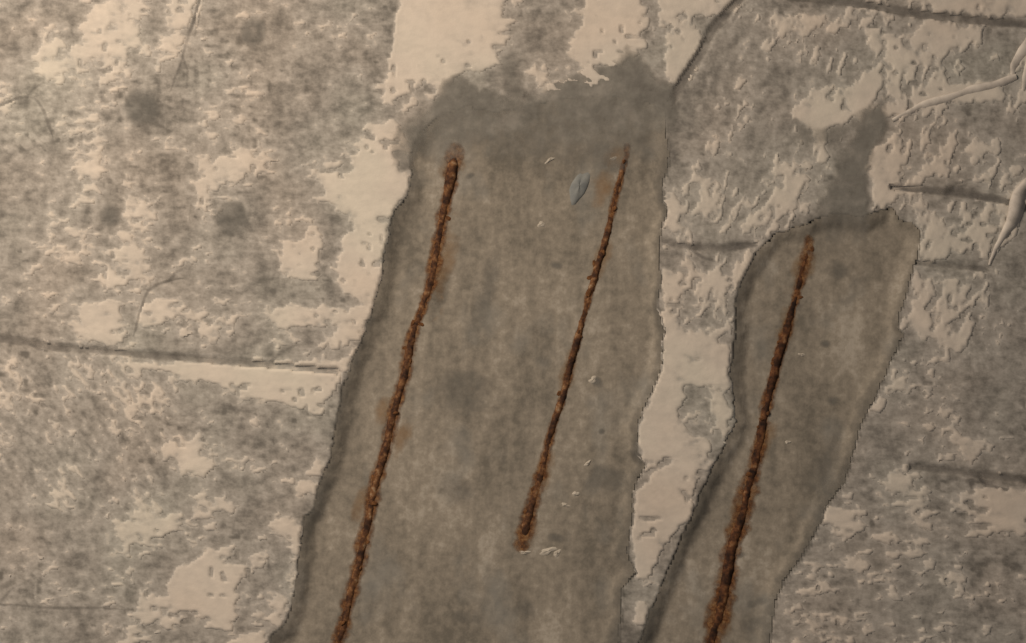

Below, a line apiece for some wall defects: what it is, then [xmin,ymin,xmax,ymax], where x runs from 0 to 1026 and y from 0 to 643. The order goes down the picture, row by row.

crack [830,0,920,15]
crack [983,18,1026,26]
crack [672,52,702,101]
peeling [126,59,280,232]
rust [606,144,630,227]
crack [961,193,1009,203]
peeling [268,200,325,292]
rust [333,144,463,643]
peeling [100,466,240,560]
rust [515,430,554,551]
rust [704,432,767,643]
peeling [942,487,1026,540]